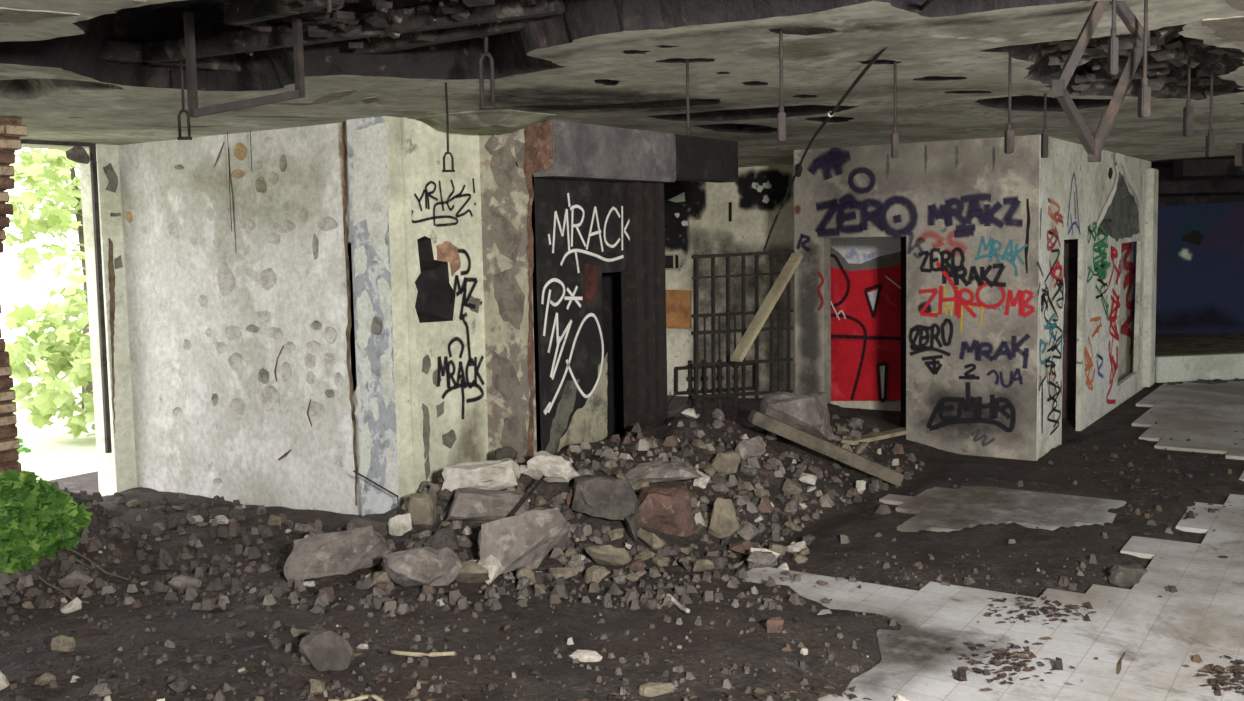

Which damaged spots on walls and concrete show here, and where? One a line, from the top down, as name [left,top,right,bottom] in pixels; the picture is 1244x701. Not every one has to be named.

spalling [0,0,1092,106]
spalling [913,0,1244,112]
flaking render [0,124,28,277]
spalling [103,163,118,193]
spalling [108,238,123,433]
flaking render [110,211,148,235]
flaking render [199,238,236,308]
peeling [205,122,399,515]
flaking render [0,329,22,473]